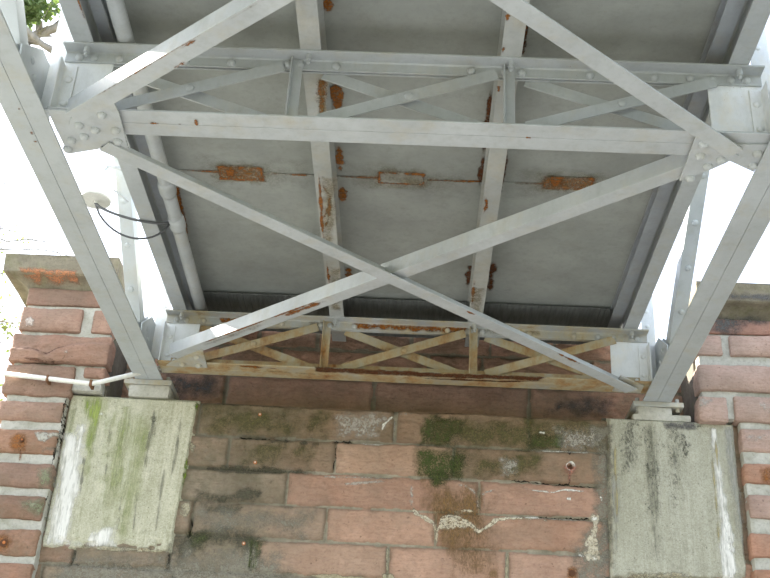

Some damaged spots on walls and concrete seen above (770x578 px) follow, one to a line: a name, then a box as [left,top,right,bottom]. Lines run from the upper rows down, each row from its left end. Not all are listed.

corrosion [317,80,344,113]
corrosion [484,86,500,122]
corrosion [187,166,276,182]
corrosion [335,147,486,185]
corrosion [525,177,595,190]
corrosion [319,180,348,240]
corrosion [465,264,497,314]
corrosion [315,367,545,382]
damp [665,423,700,464]
damp [47,425,84,545]
damp [413,449,546,573]
damp [712,428,741,578]